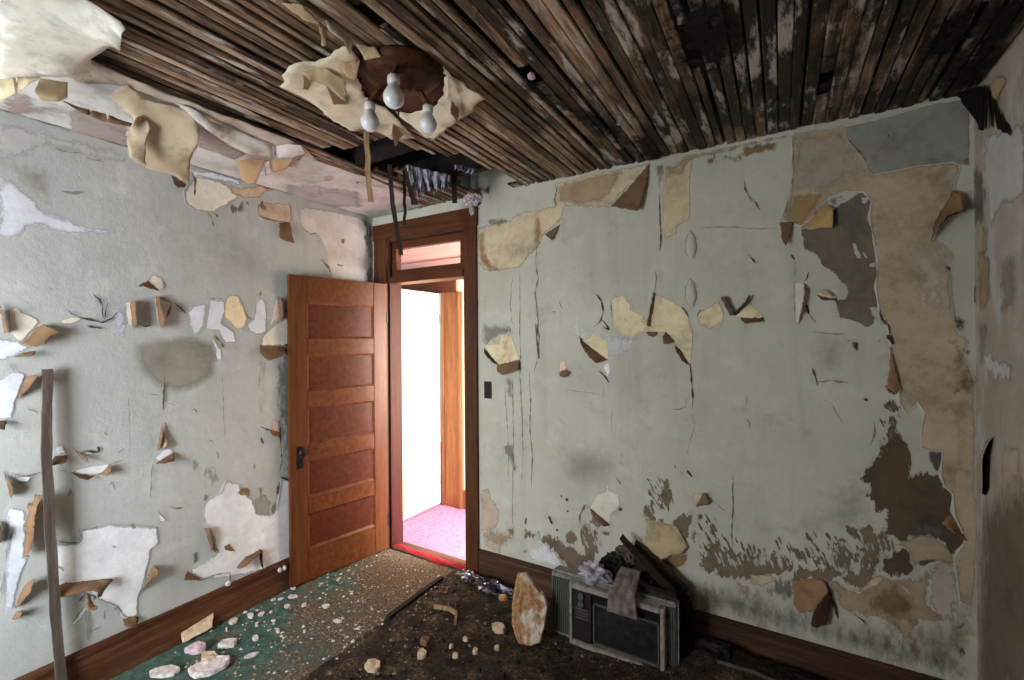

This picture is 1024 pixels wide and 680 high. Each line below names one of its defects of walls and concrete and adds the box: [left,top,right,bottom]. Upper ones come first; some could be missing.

leakage [656,0,741,74]
spalling [801,193,885,327]
flaking render [206,300,236,360]
flaking render [248,299,266,334]
leakage [140,341,214,388]
spalling [644,390,963,597]
hole [979,437,993,496]
spalling [524,504,609,570]